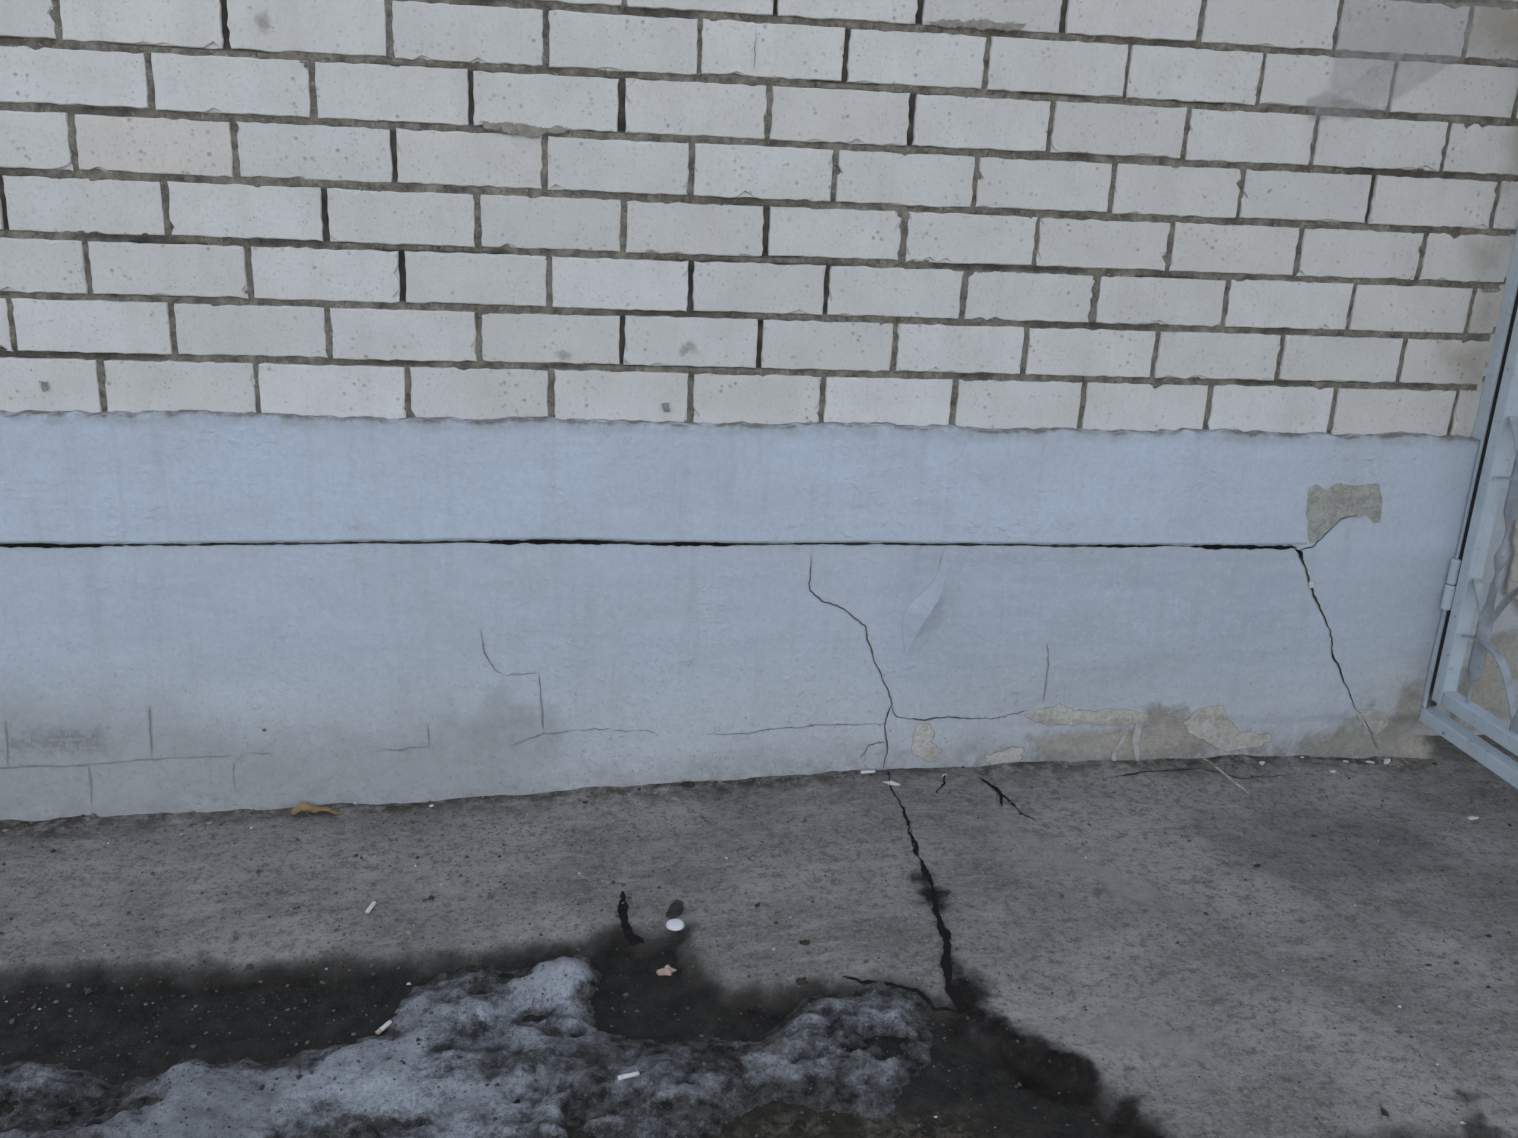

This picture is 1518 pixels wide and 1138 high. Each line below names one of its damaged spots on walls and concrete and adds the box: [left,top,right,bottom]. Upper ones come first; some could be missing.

peeling [1304,480,1385,547]
crack [0,514,1378,1014]
spalling [985,702,1273,765]